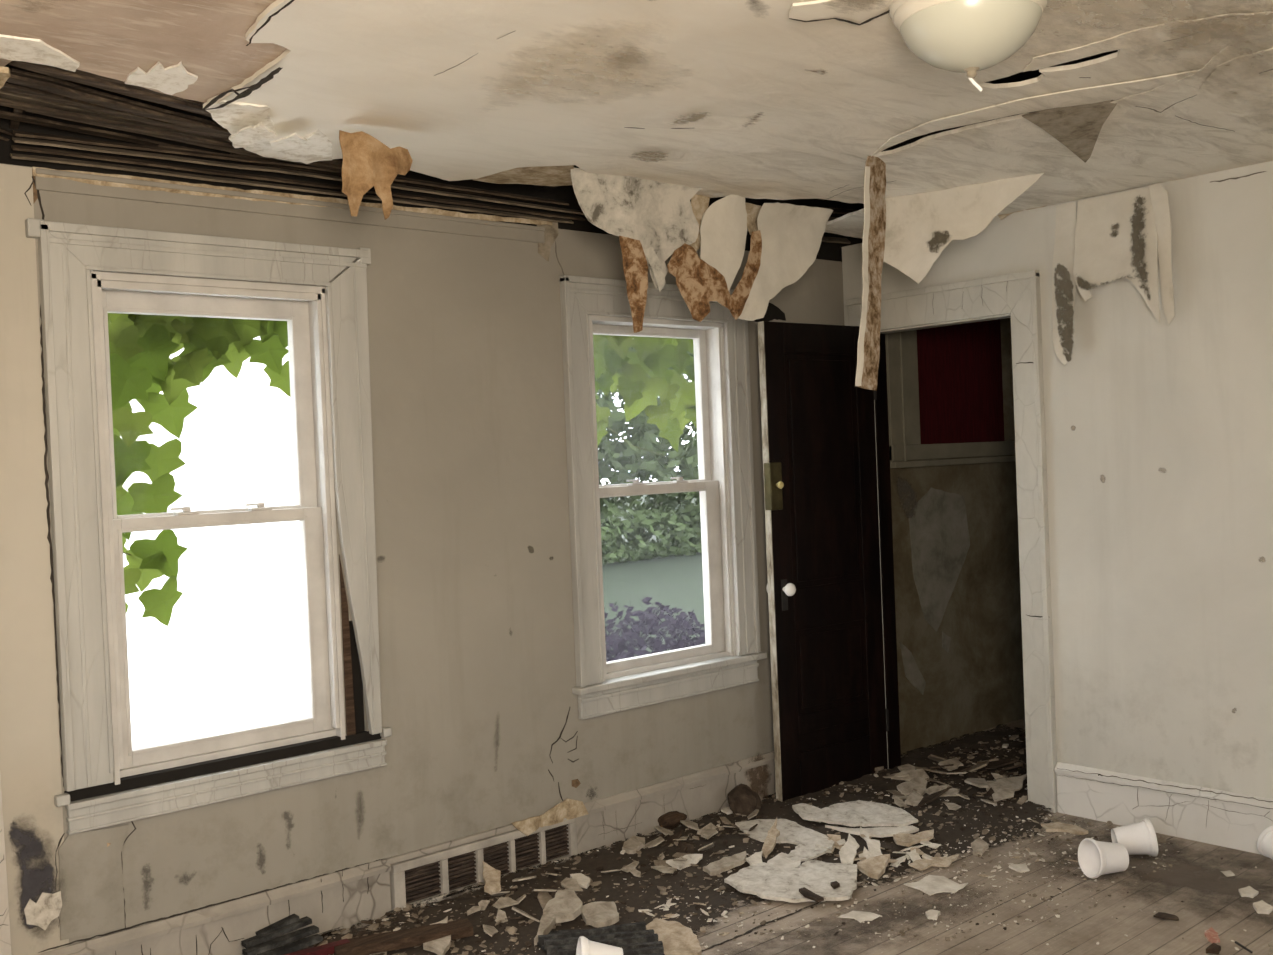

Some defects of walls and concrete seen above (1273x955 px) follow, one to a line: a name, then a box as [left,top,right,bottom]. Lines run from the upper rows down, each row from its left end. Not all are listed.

crack [246,0,294,46]
peeling [789,0,893,21]
flaking render [0,0,332,164]
flaking render [473,165,574,186]
spalling [754,303,786,322]
crack [548,708,579,801]
crack [1057,768,1273,823]
flaking render [24,891,62,930]
crack [38,821,382,955]